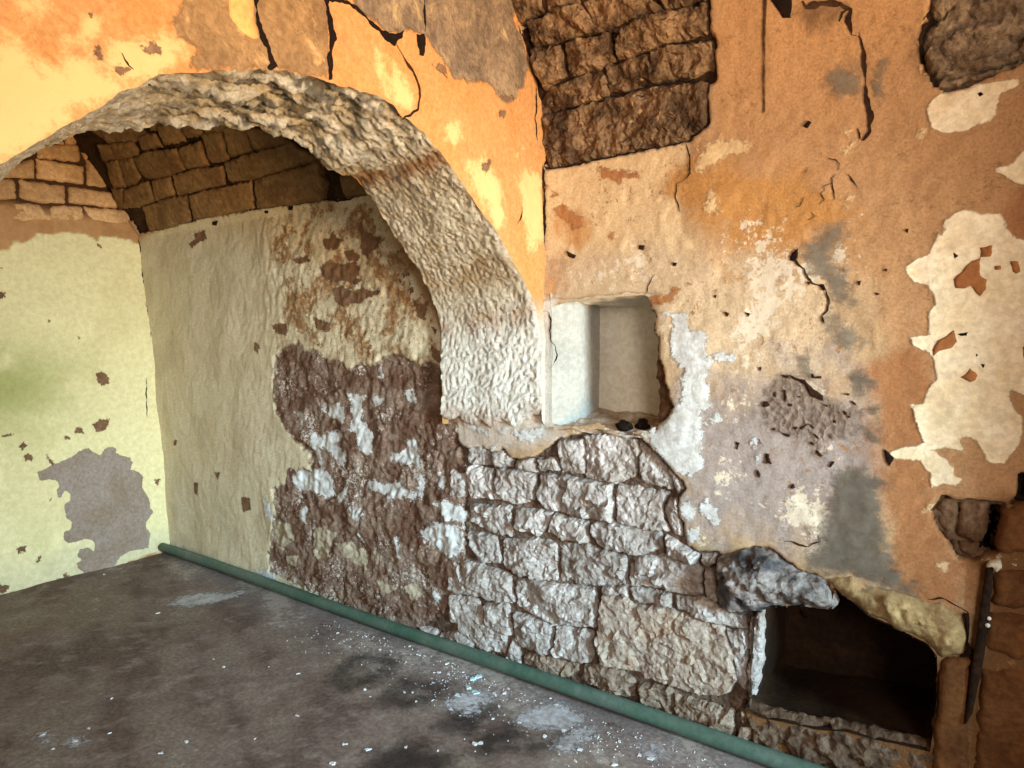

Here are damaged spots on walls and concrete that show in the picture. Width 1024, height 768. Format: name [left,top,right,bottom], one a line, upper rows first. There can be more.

spalling [174,0,330,78]
crack [324,0,426,121]
spalling [355,0,751,184]
crack [802,0,874,141]
spalling [915,0,1024,140]
crack [788,256,830,316]
peeling [2,433,160,580]
peeling [65,419,110,440]
peeling [96,372,110,386]
spalling [241,217,766,740]
spalling [762,374,861,468]
peeling [890,210,1024,572]